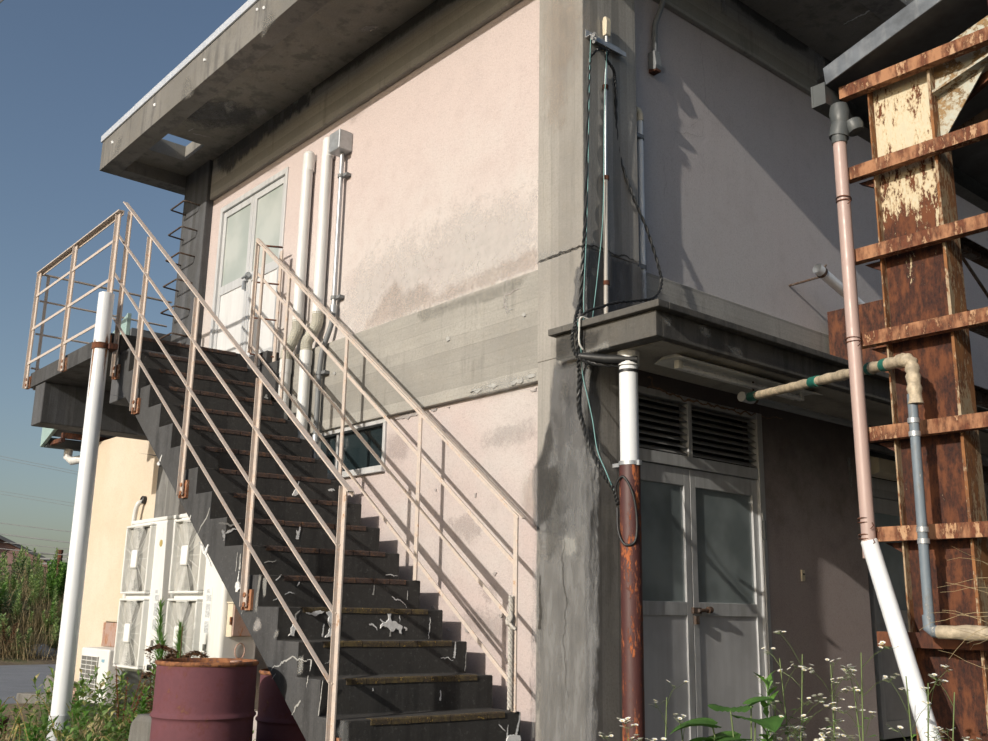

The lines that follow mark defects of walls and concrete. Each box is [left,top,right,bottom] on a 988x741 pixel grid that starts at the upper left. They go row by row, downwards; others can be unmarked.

leakage [187,0,453,173]
leakage [573,249,646,320]
leakage [532,333,600,741]
peeling [288,610,332,638]
peeling [369,614,407,636]
peeling [499,712,521,741]